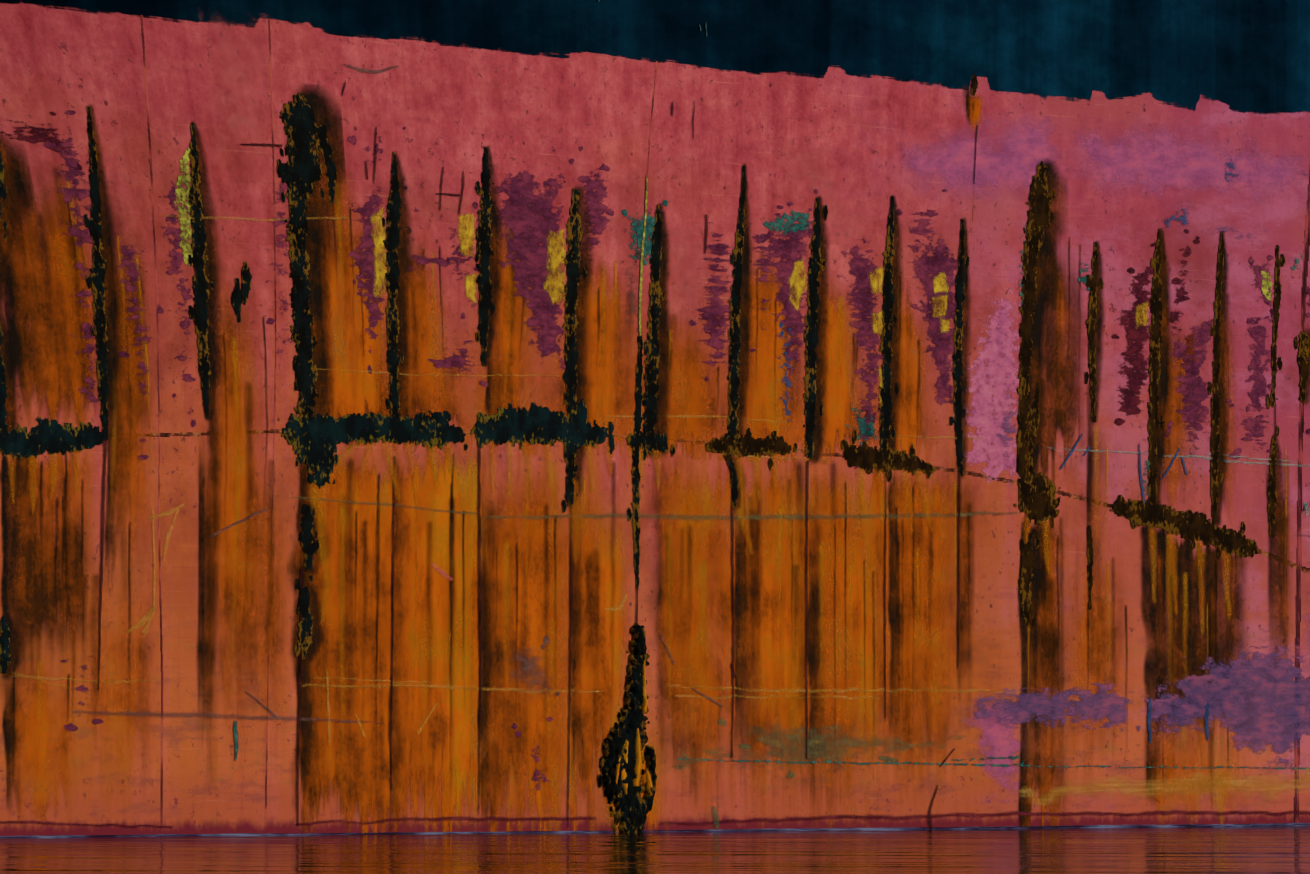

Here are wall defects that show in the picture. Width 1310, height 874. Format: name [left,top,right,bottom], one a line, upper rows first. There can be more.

rust [0,106,150,816]
rust [188,88,970,833]
rust [1014,161,1288,826]
rust [1295,331,1310,403]